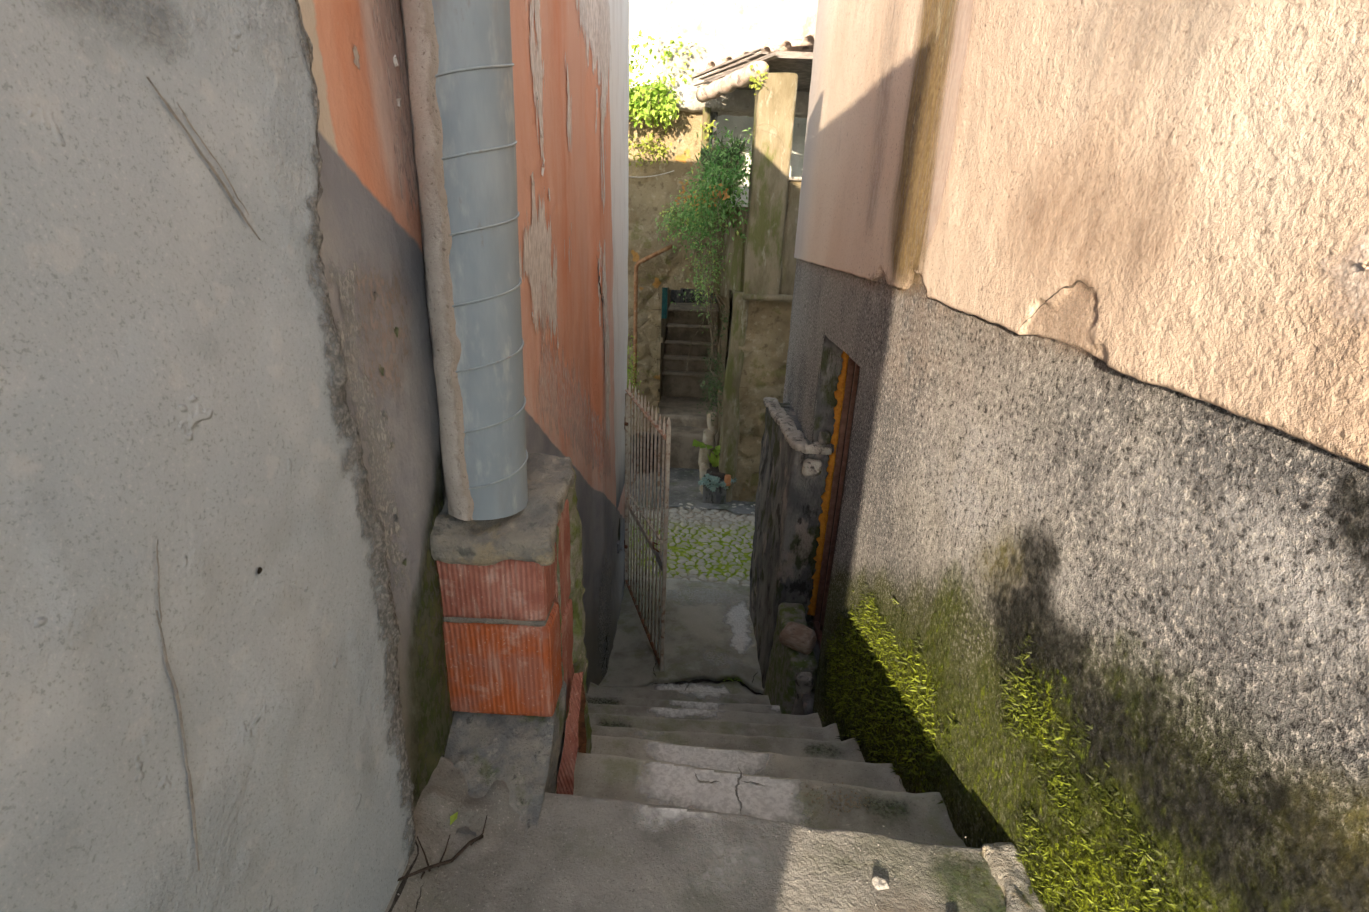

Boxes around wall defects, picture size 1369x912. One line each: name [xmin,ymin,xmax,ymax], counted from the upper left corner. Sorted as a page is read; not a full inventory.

peeling [519,0,572,348]
peeling [576,0,611,214]
spalling [1321,232,1369,317]
leakage [1337,477,1369,569]
crack [694,765,768,813]
leakage [991,528,1369,912]